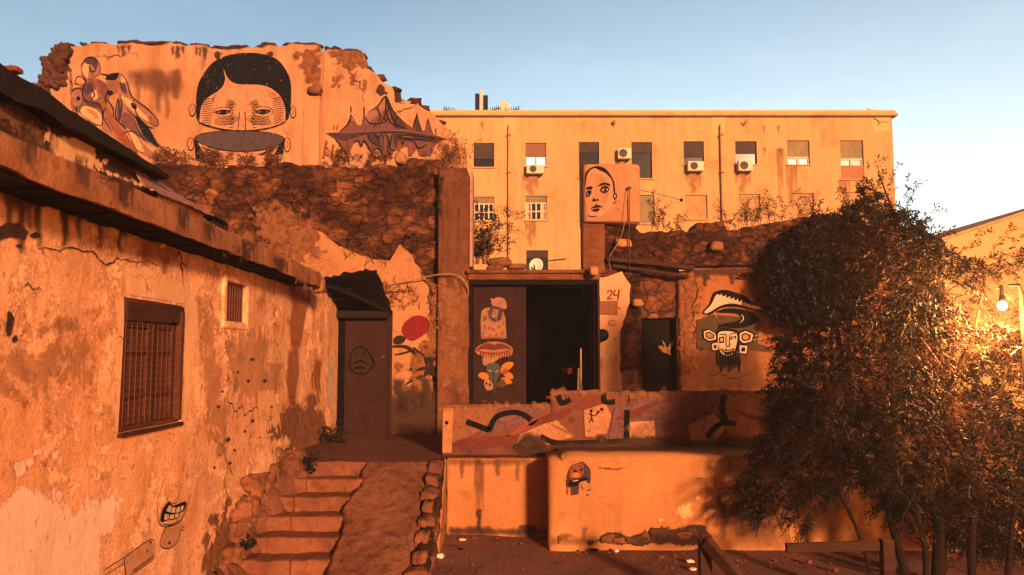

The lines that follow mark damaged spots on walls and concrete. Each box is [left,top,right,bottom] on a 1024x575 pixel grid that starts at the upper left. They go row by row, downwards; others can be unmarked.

spalling [37,42,74,94]
damp [134,71,179,103]
crack [39,247,186,296]
crack [227,393,258,416]
peeling [0,448,124,575]
flaking render [588,496,715,546]